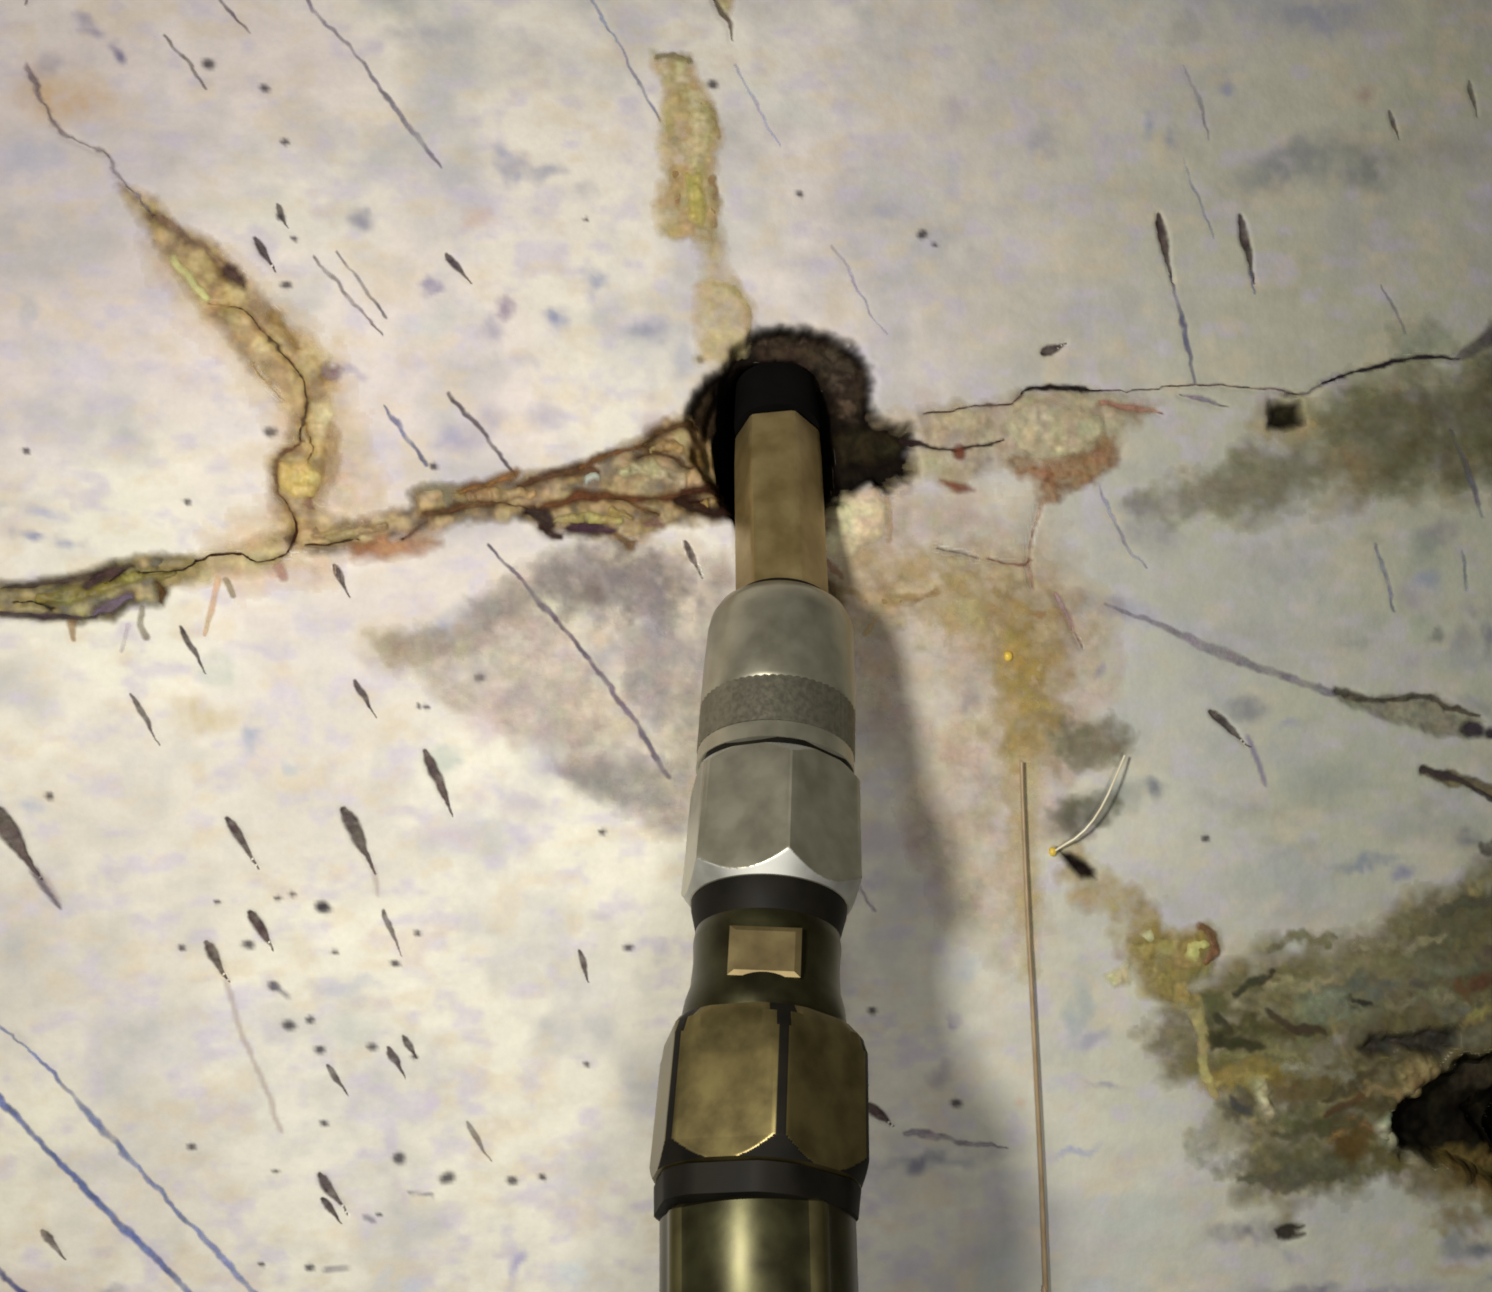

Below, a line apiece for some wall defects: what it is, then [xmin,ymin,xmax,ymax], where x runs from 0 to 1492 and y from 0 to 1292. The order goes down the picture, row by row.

crack [0,67,732,651]
spalling [688,329,914,522]
crack [824,489,888,556]
crack [898,333,1492,648]
water stain [1184,334,1492,512]
water stain [827,494,1126,927]
water stain [1074,844,1492,1196]
spalling [1361,1029,1492,1187]